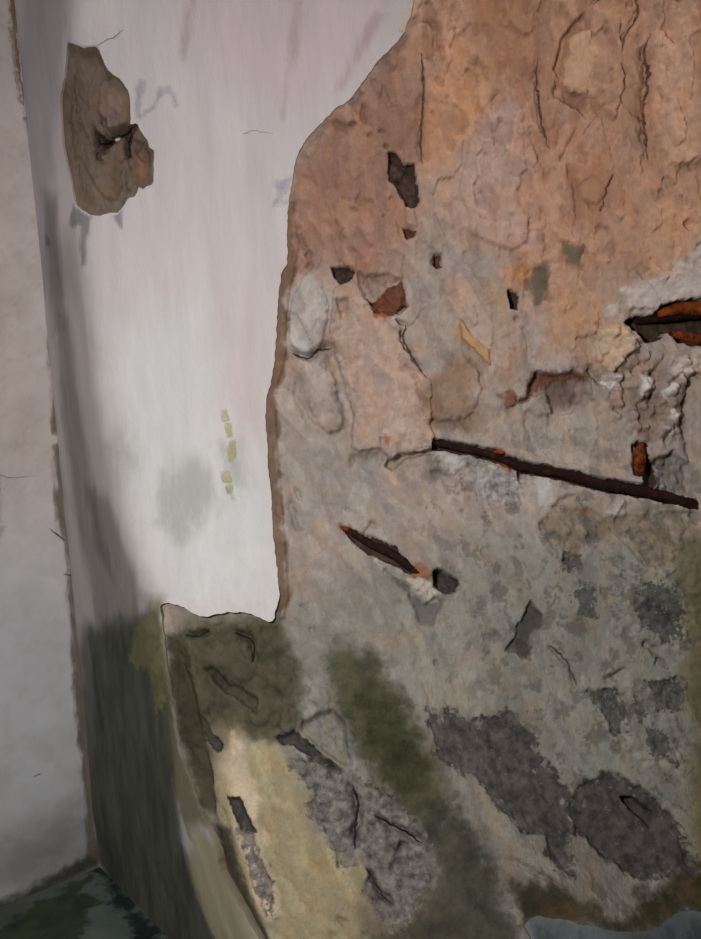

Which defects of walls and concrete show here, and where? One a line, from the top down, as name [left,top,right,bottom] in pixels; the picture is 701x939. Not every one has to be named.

spalling [62,43,154,216]
corrosion [657,301,701,317]
corrosion [670,331,701,345]
spalling [162,0,701,939]
water stain [0,405,159,939]
water stain [167,637,216,812]
water stain [217,823,276,939]
crack [352,784,421,904]
water stain [287,695,518,939]